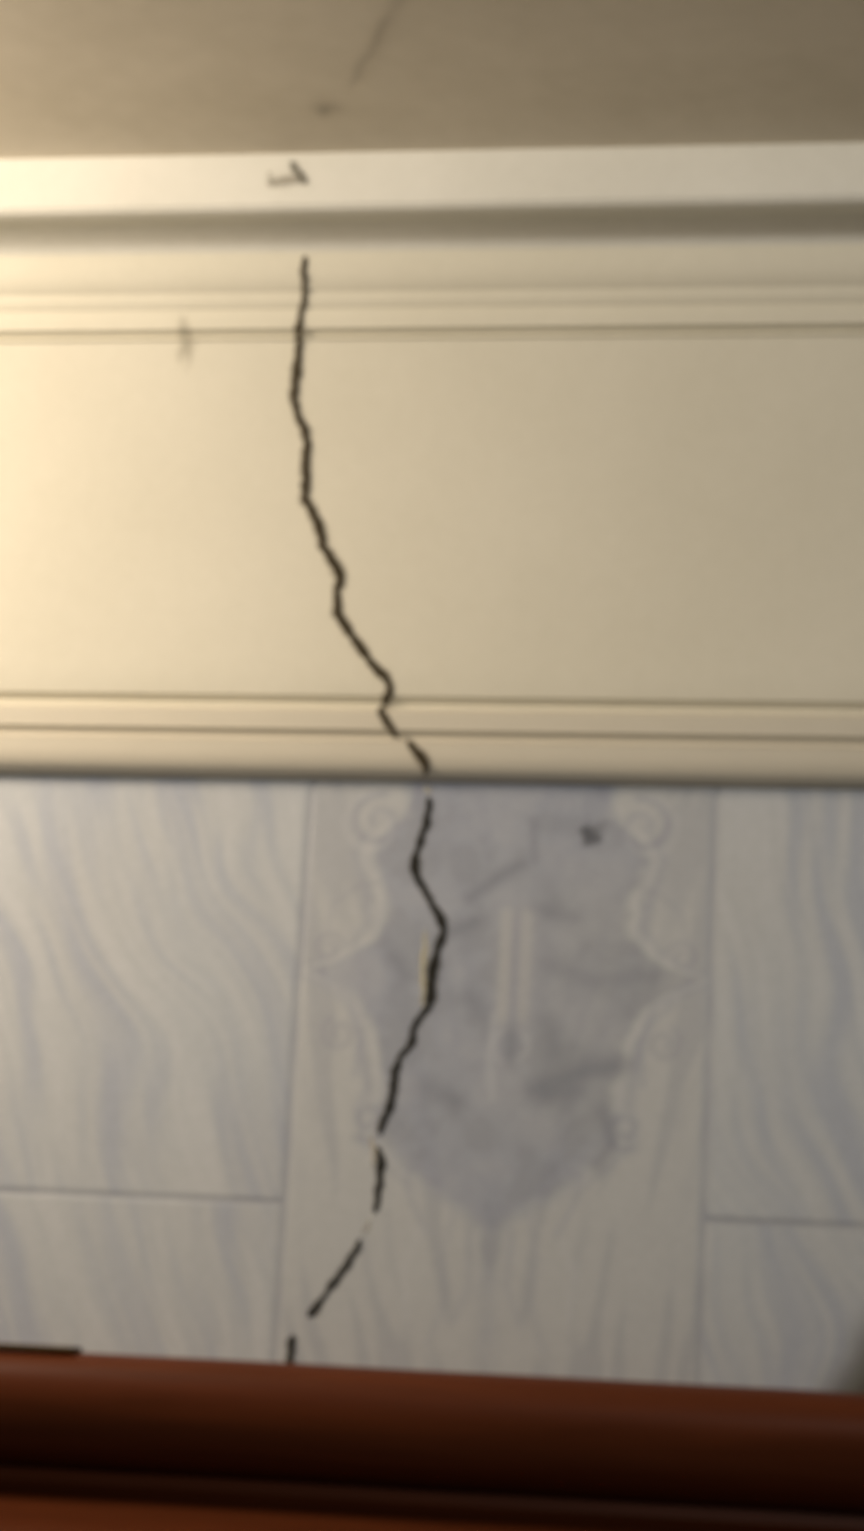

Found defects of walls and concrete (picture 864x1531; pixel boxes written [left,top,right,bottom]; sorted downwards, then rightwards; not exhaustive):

crack [286,256,447,1363]